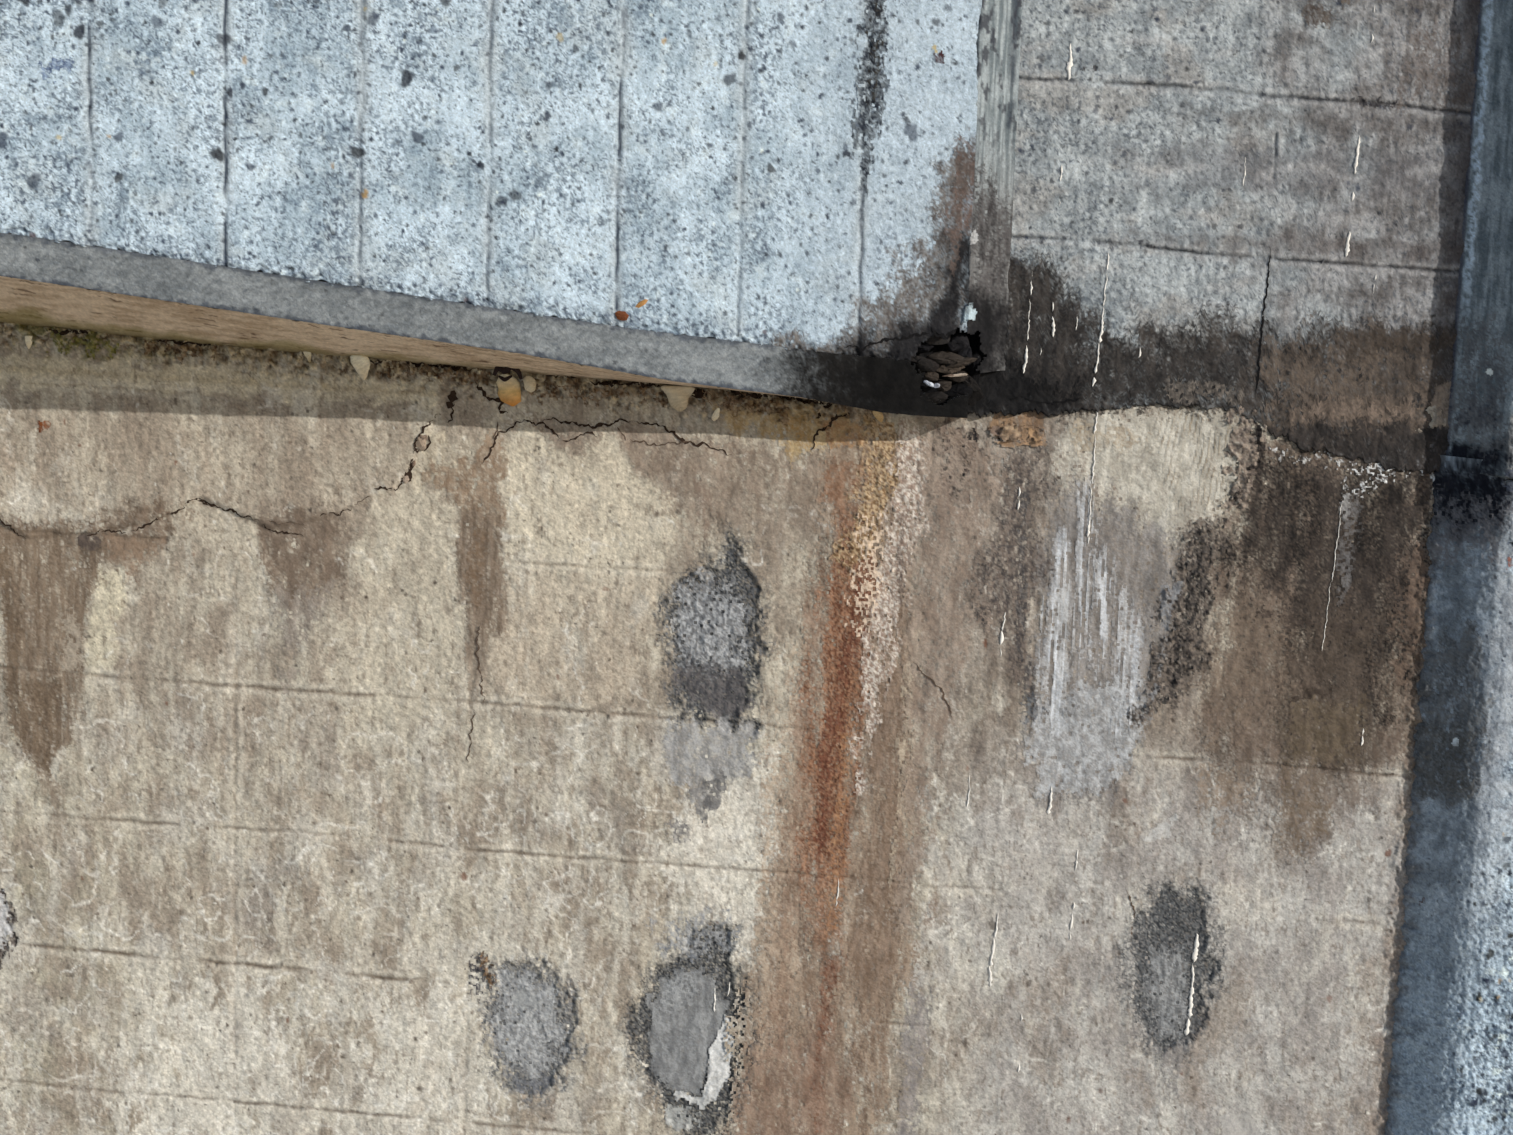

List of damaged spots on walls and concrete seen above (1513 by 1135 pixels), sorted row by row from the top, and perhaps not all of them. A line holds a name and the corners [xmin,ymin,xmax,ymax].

water stain [848,0,896,197]
crack [45,328,92,336]
water stain [0,493,198,838]
crack [157,339,212,347]
water stain [249,498,355,701]
crack [87,360,850,537]
water stain [413,410,827,846]
corrosion [712,393,943,1135]
spalling [911,333,984,406]
peeling [986,402,1270,728]
water stain [751,124,1513,937]
spalling [0,884,22,970]